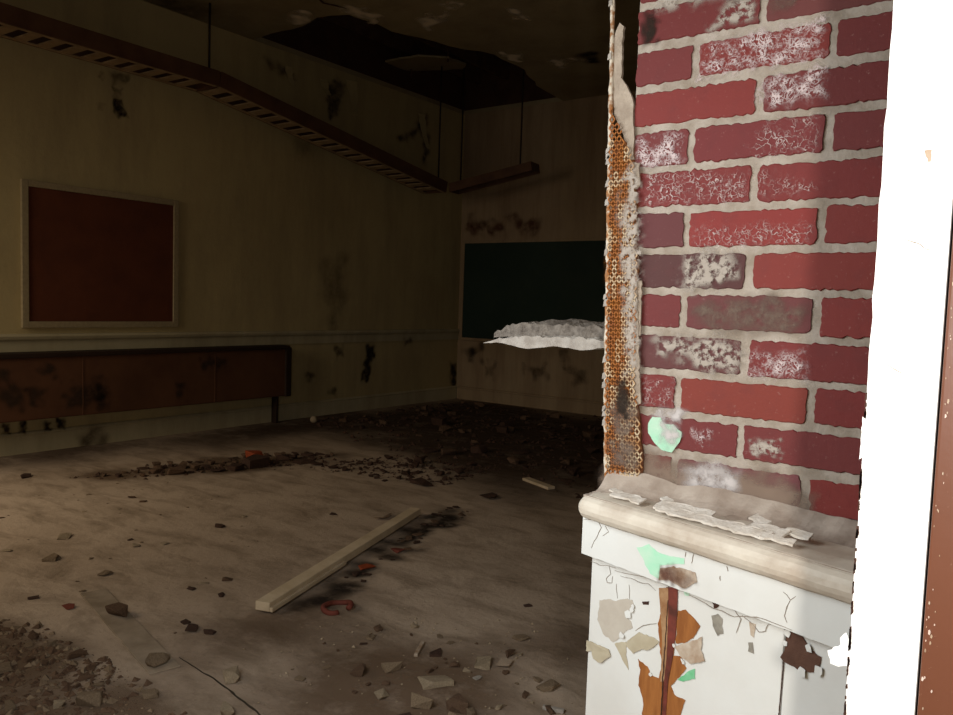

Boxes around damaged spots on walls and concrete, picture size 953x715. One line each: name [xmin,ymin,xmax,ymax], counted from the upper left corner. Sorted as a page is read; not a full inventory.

spalling [262,10,556,111]
rust [611,148,633,365]
crack [584,519,656,599]
flaking render [583,392,869,715]
crack [686,592,796,633]